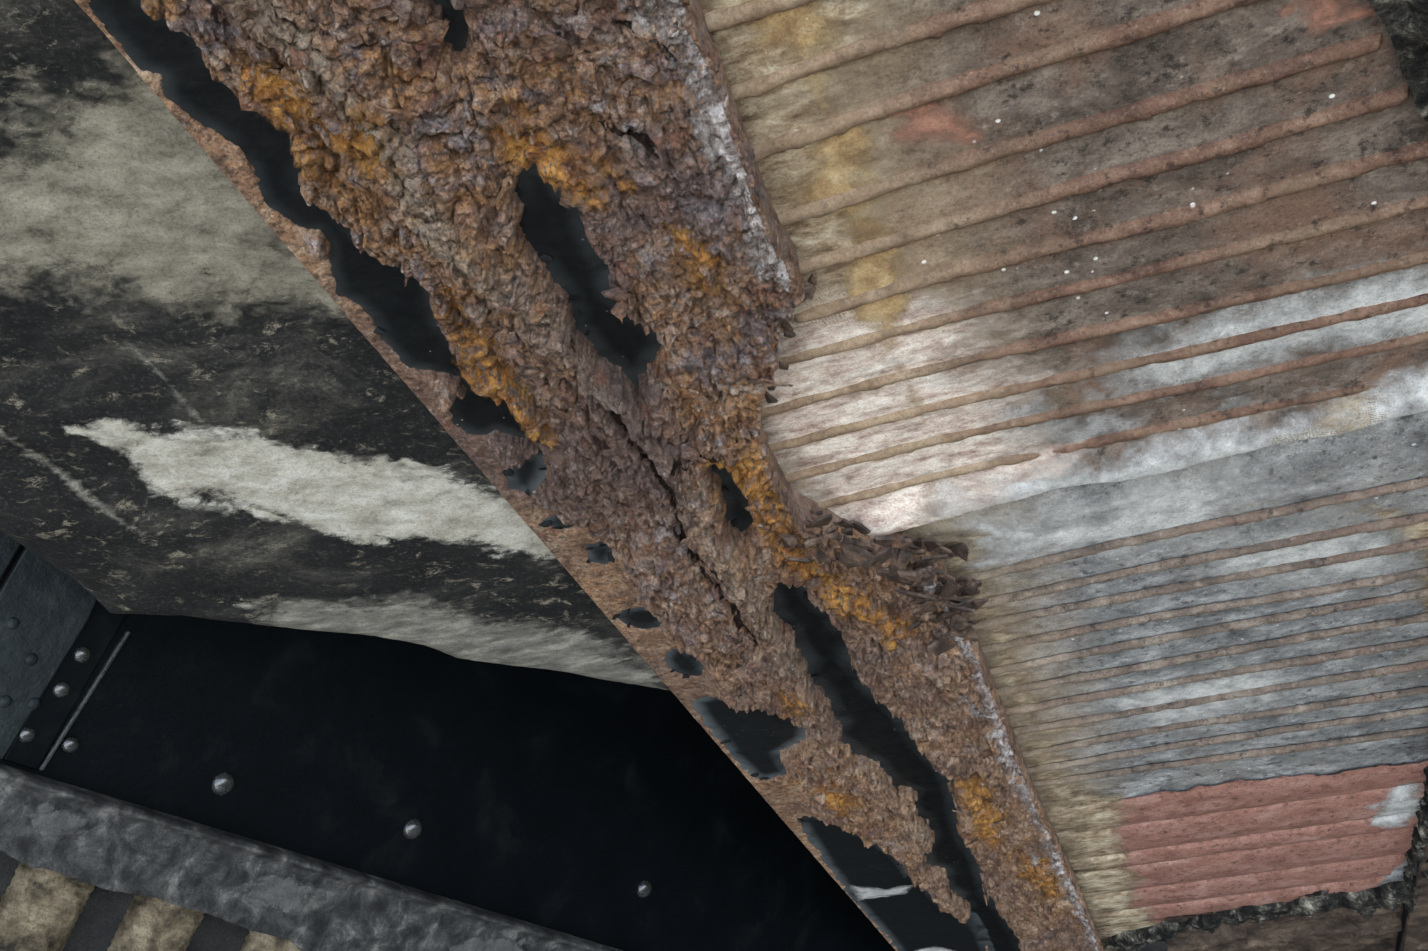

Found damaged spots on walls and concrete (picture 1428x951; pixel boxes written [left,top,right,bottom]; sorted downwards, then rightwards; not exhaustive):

corrosion [240,53,388,182]
corrosion [488,103,634,211]
corrosion [671,229,720,297]
spalling [761,272,817,338]
corrosion [439,287,557,458]
peeling [735,361,793,407]
corrosion [705,447,911,651]
spalling [236,591,716,690]
peeling [691,685,818,780]
peeling [711,428,1037,951]
corrosion [955,774,1060,900]
peeling [444,936,526,951]